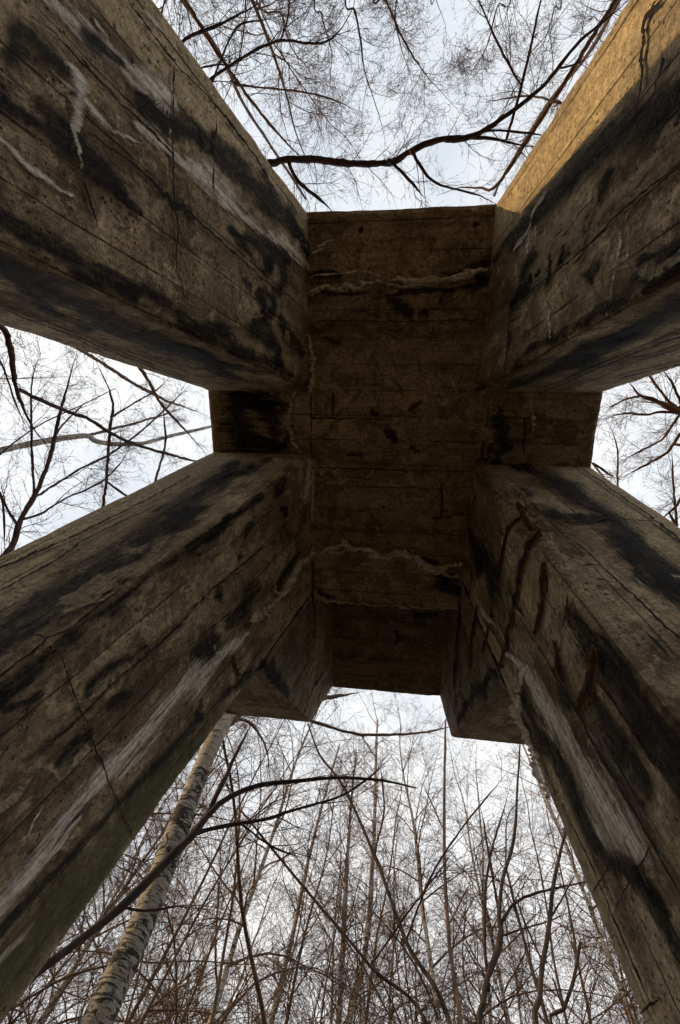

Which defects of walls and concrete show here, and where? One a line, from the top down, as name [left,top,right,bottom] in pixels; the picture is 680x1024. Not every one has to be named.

crack [41,0,287,304]
leakage [0,0,680,714]
leakage [0,529,680,972]
rust [495,502,547,673]
rust [576,645,655,766]